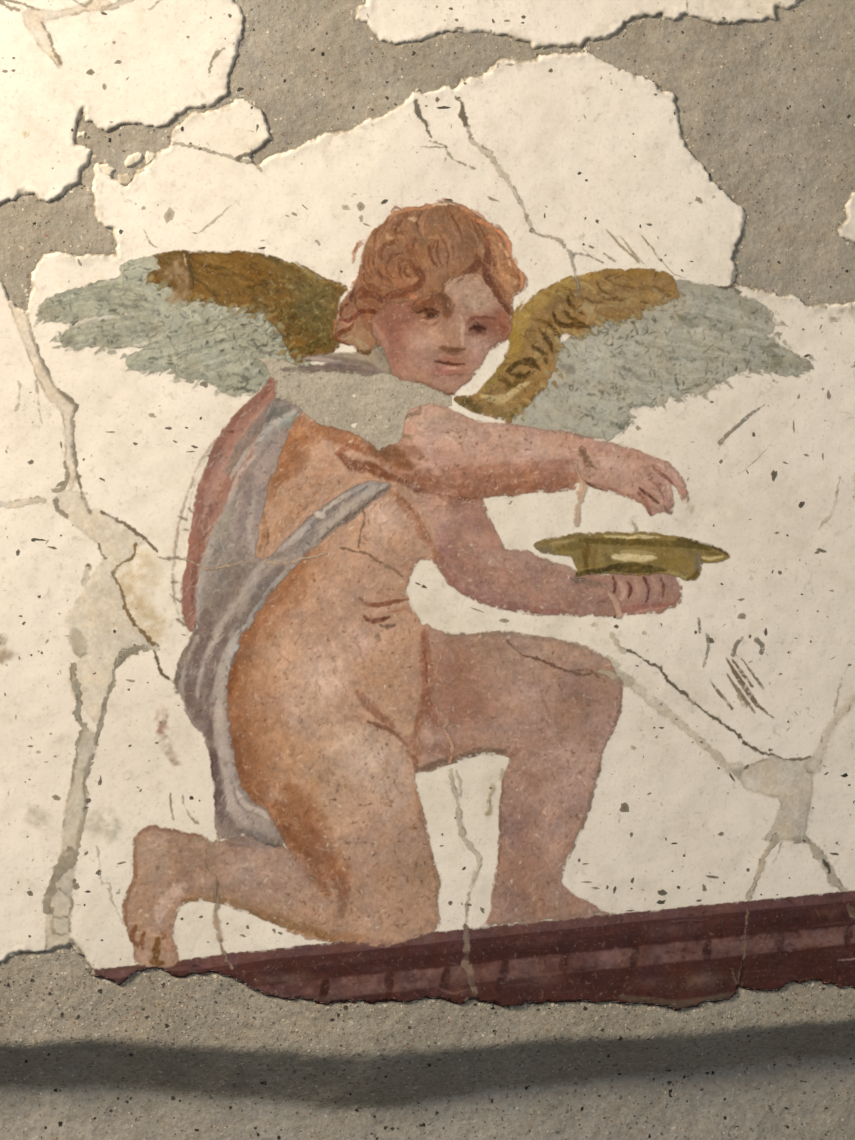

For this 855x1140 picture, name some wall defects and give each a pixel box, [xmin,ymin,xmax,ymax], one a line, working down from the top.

crack [0,0,157,67]
crack [208,48,223,73]
flaking render [0,0,855,322]
crack [414,96,603,297]
crack [184,253,193,283]
flaking render [259,358,452,451]
crack [266,508,402,576]
crack [574,446,592,526]
crack [818,473,855,529]
crack [0,302,237,970]
crack [507,581,855,777]
crack [734,833,855,988]